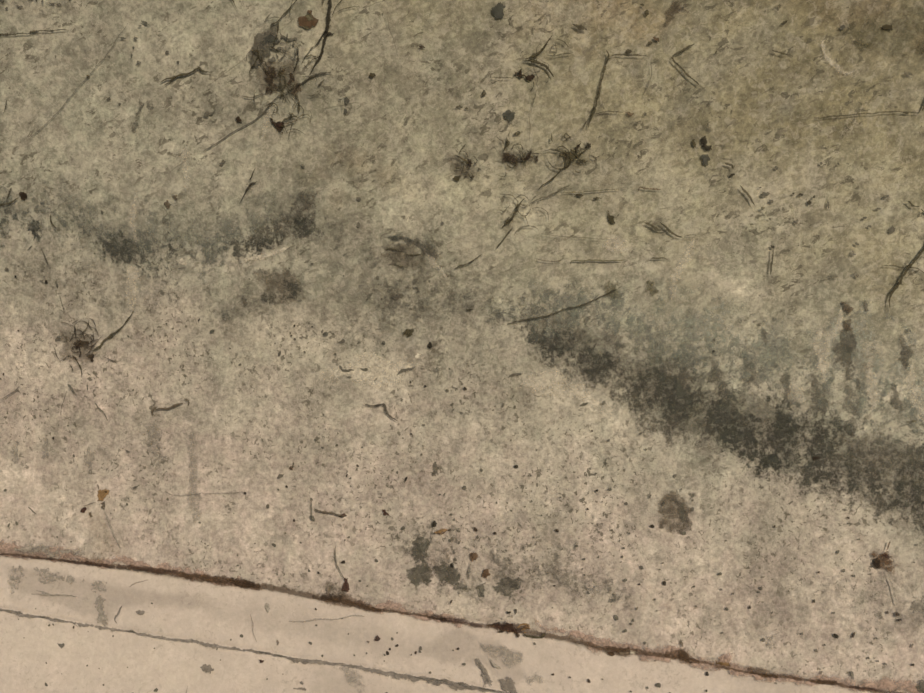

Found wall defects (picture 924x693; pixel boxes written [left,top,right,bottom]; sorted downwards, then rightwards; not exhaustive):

crack [818,105,924,119]
crack [883,248,924,306]
water stain [494,289,924,534]